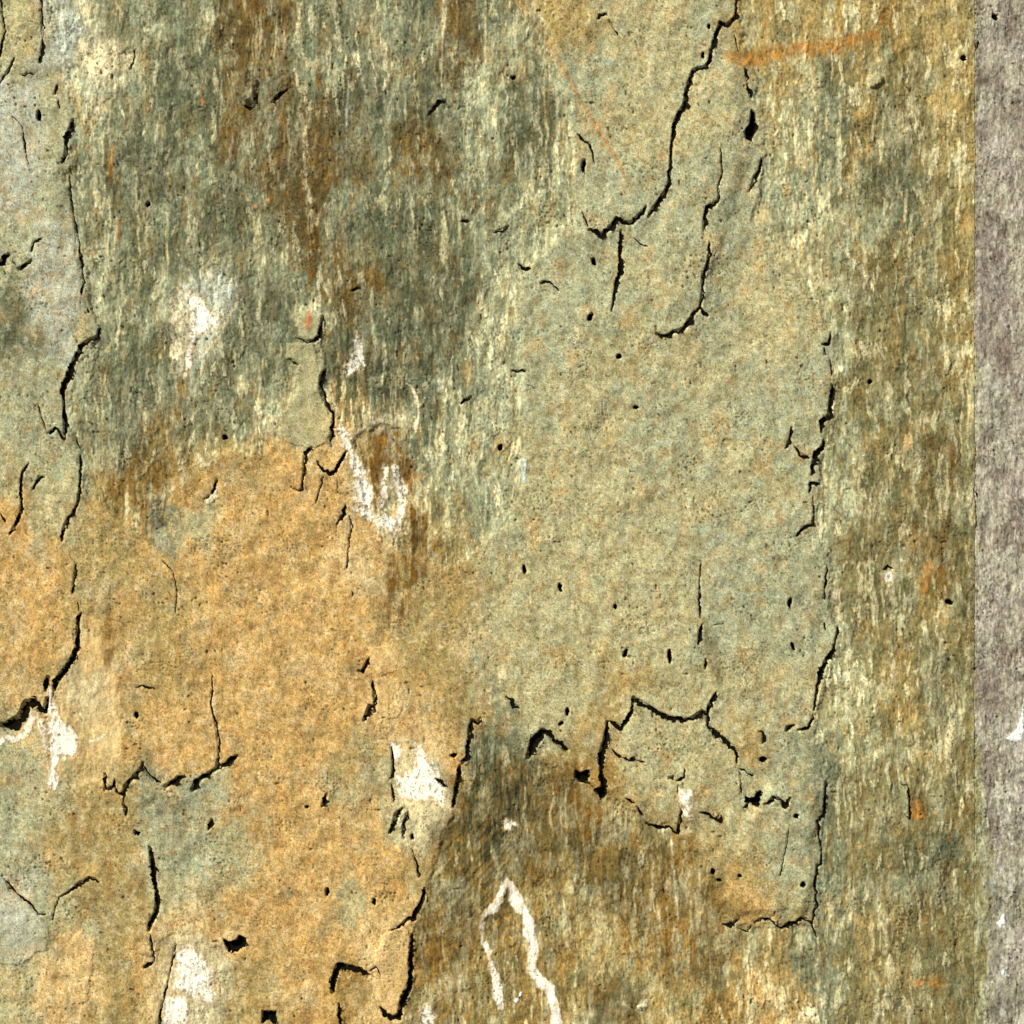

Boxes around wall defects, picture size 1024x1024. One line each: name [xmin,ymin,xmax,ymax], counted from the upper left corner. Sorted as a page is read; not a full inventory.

damp [53,9,131,80]
crack [581,0,753,338]
crack [0,0,101,541]
damp [168,268,242,380]
damp [325,314,424,542]
crack [3,565,82,731]
damp [0,660,111,790]
crack [102,675,237,815]
damp [389,738,453,861]
crack [596,693,790,876]
crack [380,746,426,1021]
damp [480,877,563,1024]